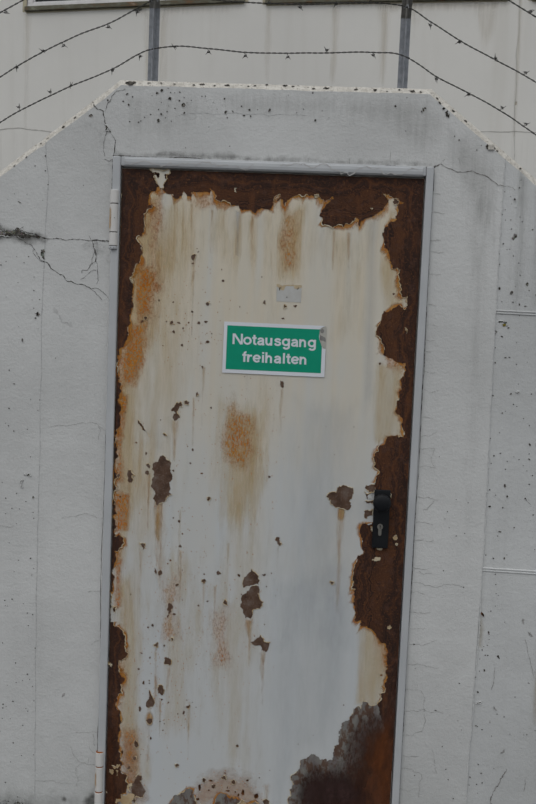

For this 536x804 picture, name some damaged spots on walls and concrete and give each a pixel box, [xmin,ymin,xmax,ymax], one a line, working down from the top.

spalling [0,228,44,239]
crack [0,227,109,300]
peeling [145,452,174,505]
rust [96,168,425,804]
peeling [169,788,197,804]
peeling [202,775,240,804]